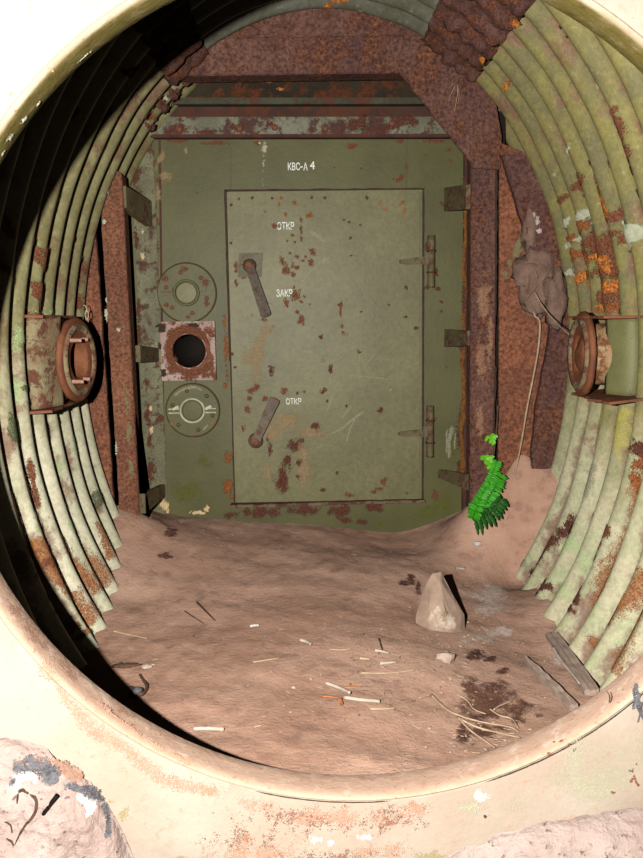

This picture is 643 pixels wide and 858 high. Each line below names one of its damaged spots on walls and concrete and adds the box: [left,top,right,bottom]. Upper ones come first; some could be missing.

rust [610,106,633,176]
rust [278,211,318,326]
peeling [562,209,594,250]
rust [557,160,632,315]
rust [163,315,237,388]
rust [456,210,494,473]
rust [8,458,115,640]
rust [271,421,320,495]
rust [535,578,555,595]
rust [528,511,577,579]
rust [567,407,643,614]
rust [586,565,643,676]